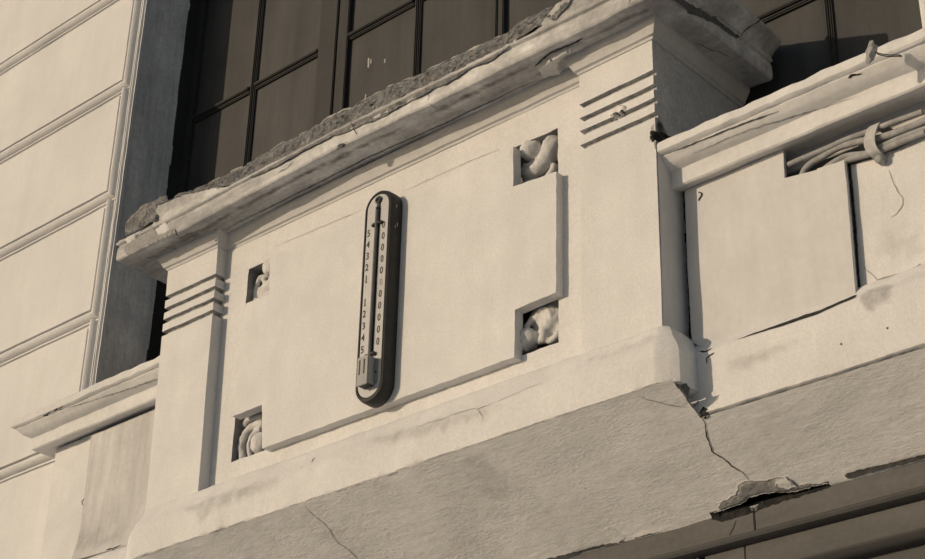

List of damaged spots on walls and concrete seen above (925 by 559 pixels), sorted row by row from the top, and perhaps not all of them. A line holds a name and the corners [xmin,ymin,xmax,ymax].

flaking render [675,0,743,38]
flaking render [535,38,586,78]
spalling [124,0,571,258]
flaking render [609,105,627,120]
crack [639,396,749,480]
peeling [845,455,925,479]
flaking render [710,477,830,522]